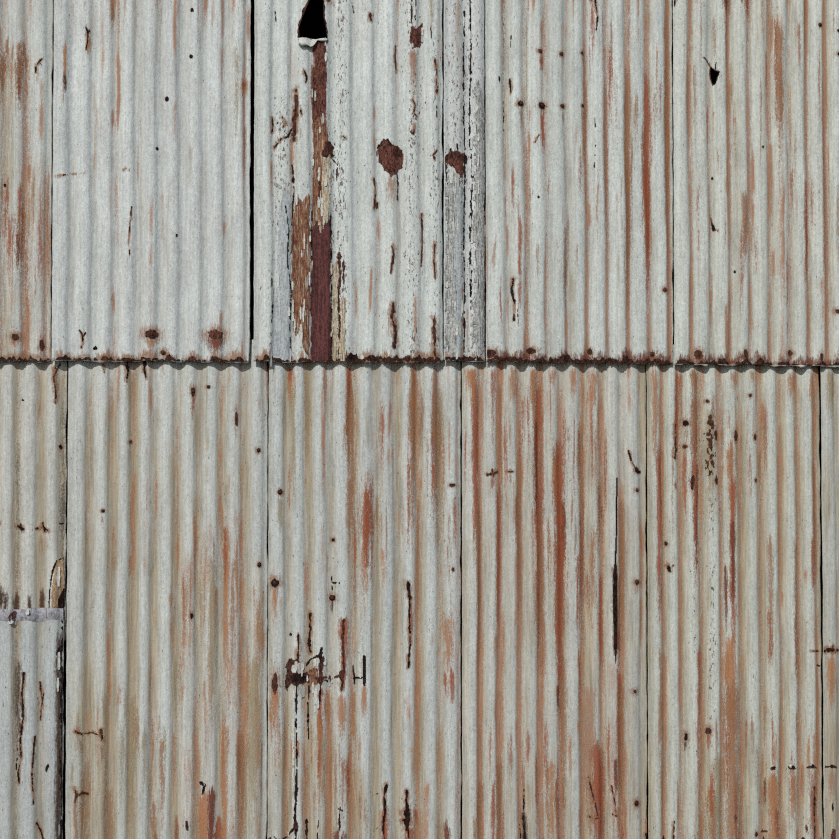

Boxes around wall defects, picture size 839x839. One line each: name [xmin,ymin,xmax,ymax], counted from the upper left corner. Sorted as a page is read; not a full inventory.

rust [0,28,28,100]
rust [0,177,51,293]
peeling [270,0,346,367]
rust [579,0,670,289]